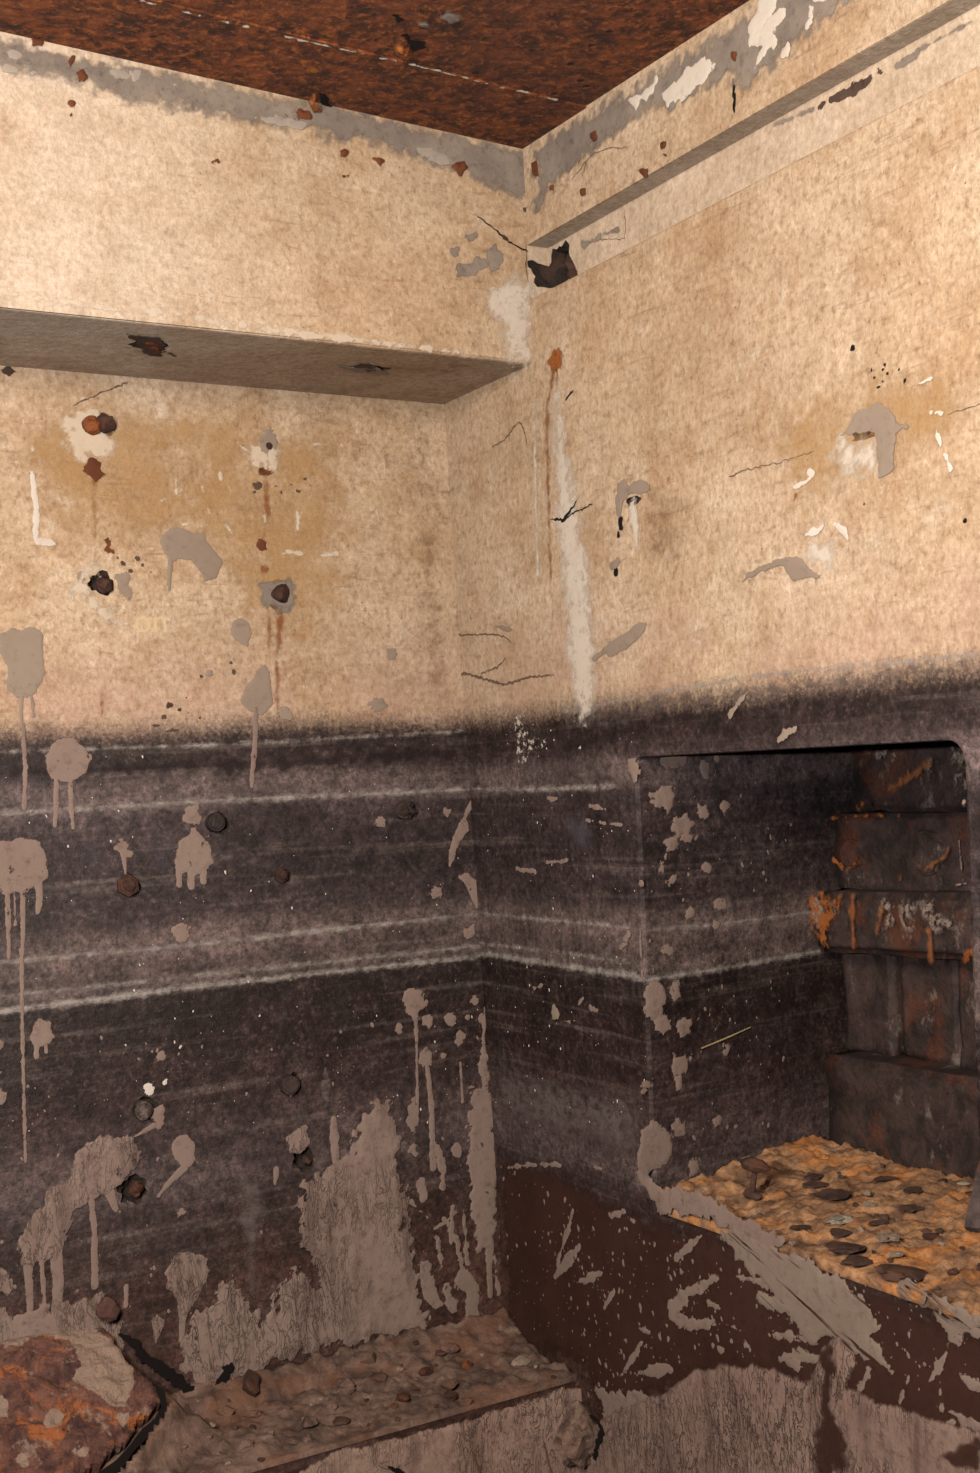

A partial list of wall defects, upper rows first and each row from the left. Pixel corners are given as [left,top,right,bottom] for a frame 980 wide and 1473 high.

peeling [0,0,849,213]
corrosion [392,11,461,58]
peeling [774,22,969,126]
spalling [450,232,509,277]
corrosion [546,348,562,428]
spalling [838,363,933,478]
leakage [68,391,789,812]
leakage [0,906,820,1014]
corrosion [808,892,855,948]
corrosion [876,899,951,962]
leakage [499,1068,634,1160]
leakage [502,1163,980,1473]